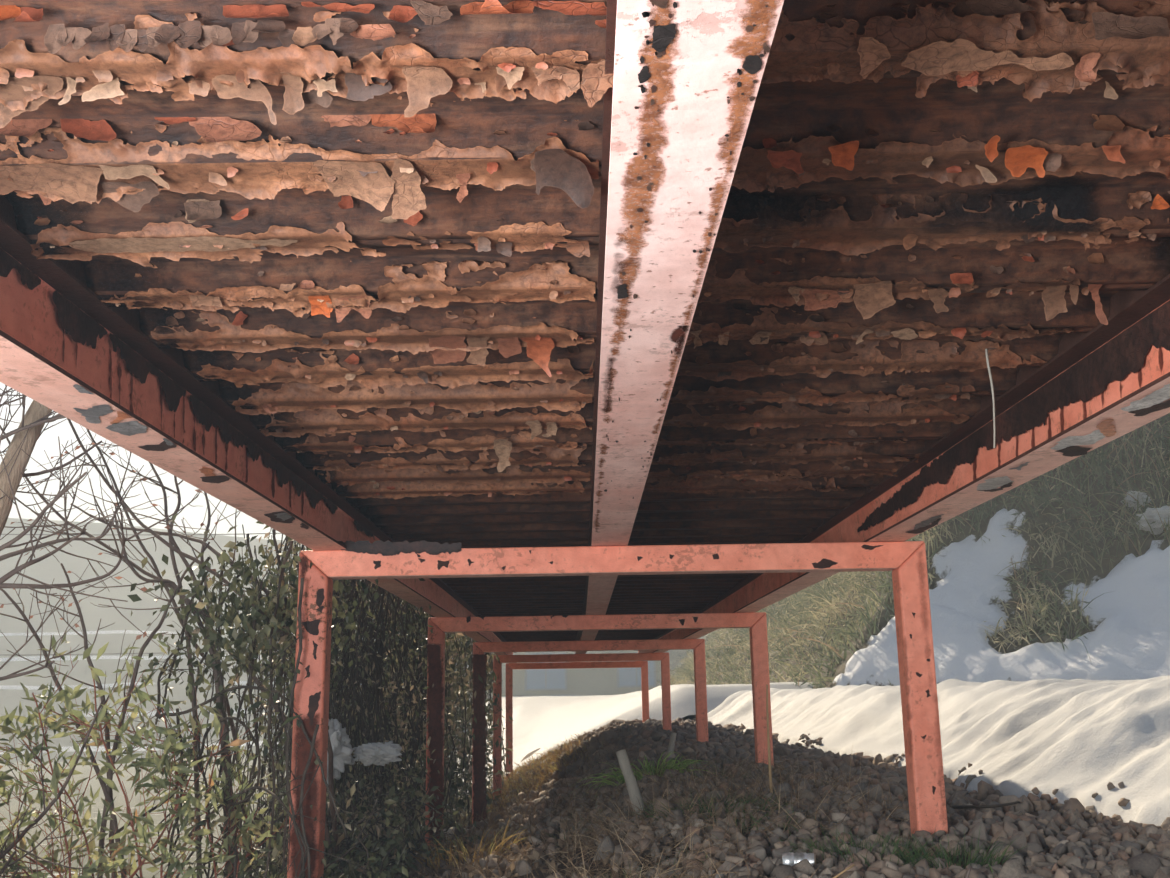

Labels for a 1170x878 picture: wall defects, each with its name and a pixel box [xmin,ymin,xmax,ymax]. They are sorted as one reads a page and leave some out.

peeling [761,0,1170,102]
peeling [0,0,614,514]
rust [594,0,679,532]
rust [641,0,777,472]
peeling [643,114,1170,534]
rust [1016,406,1064,457]
spalling [264,511,309,529]
rust [302,588,325,677]
peeling [338,520,474,570]
peeling [812,559,837,569]
rust [290,691,321,878]
rust [472,654,488,822]